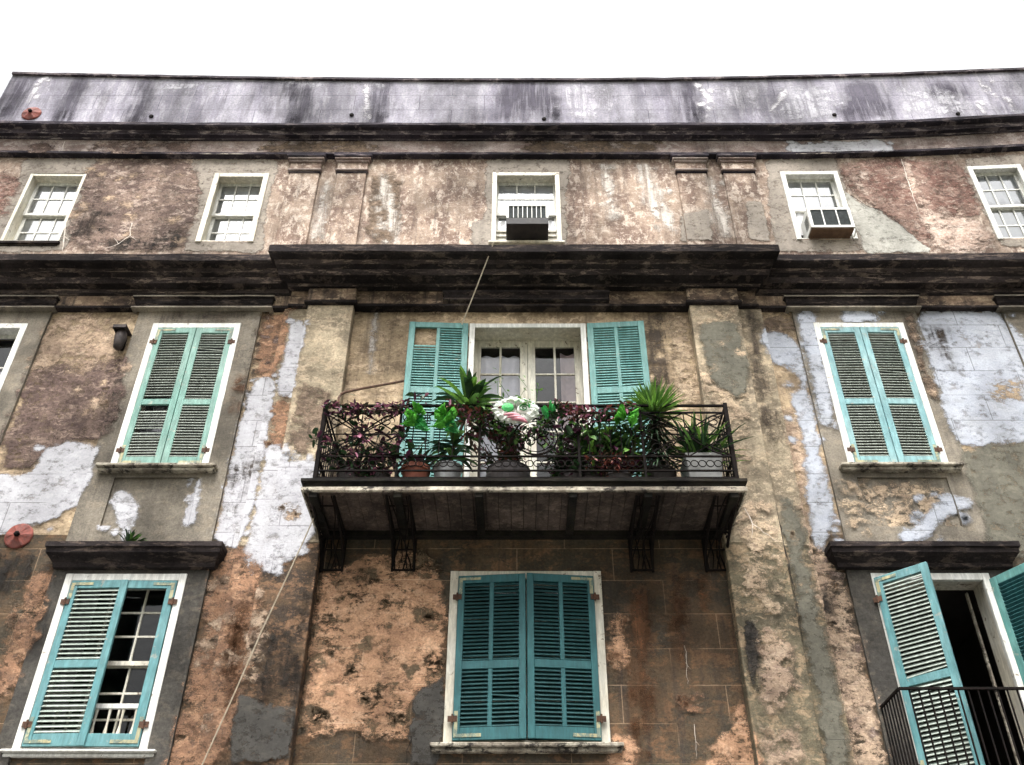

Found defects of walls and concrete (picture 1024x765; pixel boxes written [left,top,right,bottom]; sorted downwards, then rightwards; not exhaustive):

water stain [57,78,86,119]
water stain [133,80,222,120]
water stain [278,81,328,123]
water stain [498,82,619,119]
water stain [712,83,762,108]
water stain [778,82,971,121]
peeling [839,141,996,253]
peeling [242,308,308,406]
peeling [904,314,940,400]
peeling [264,382,336,462]
peeling [279,503,301,521]
peeling [735,407,944,765]